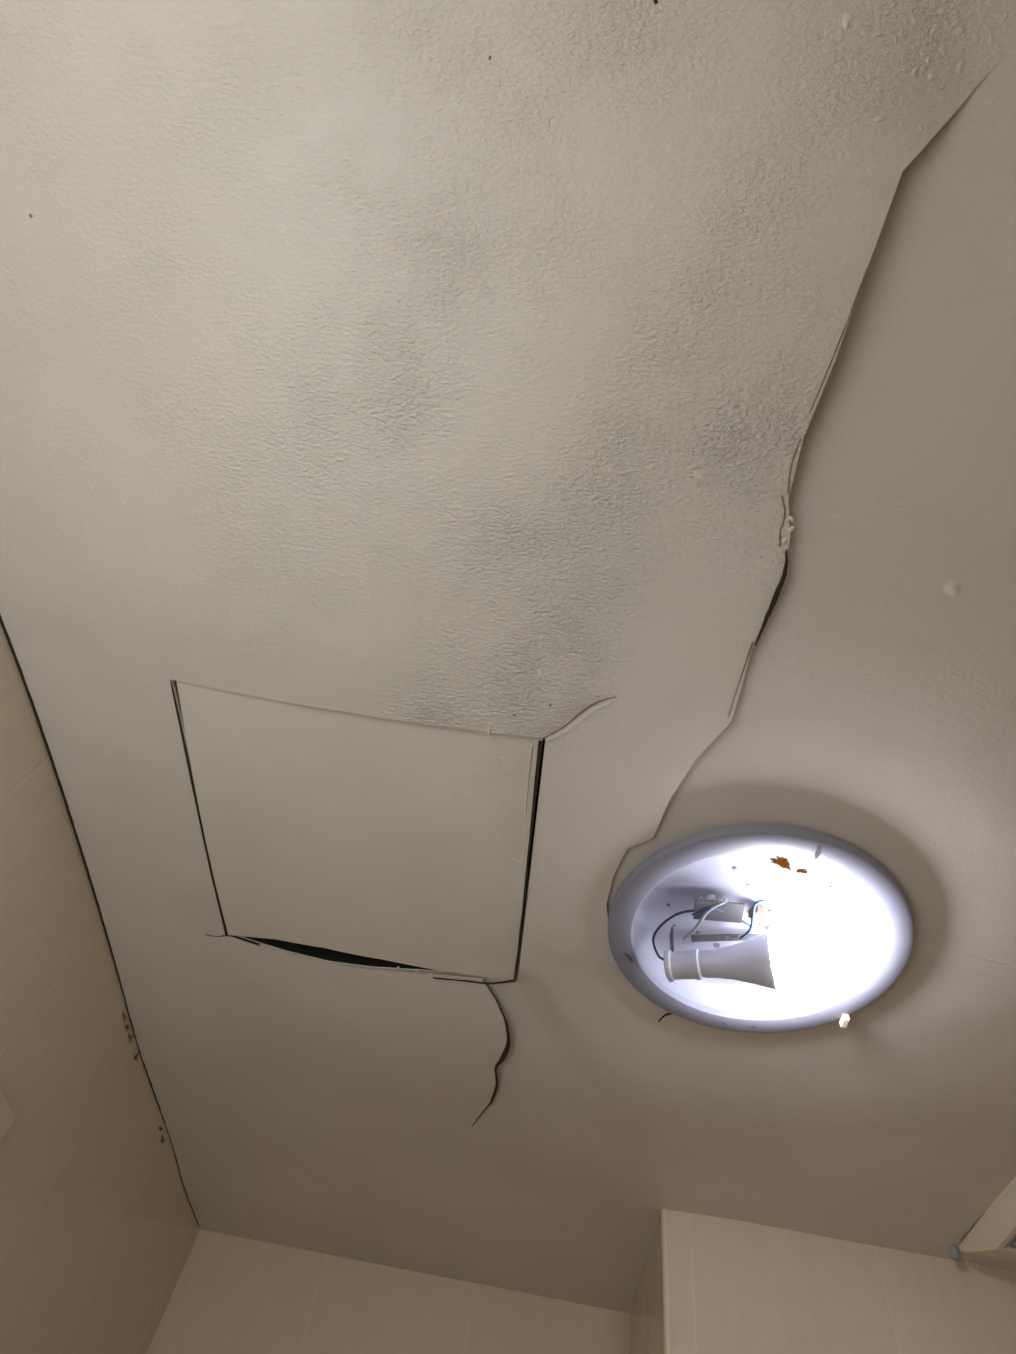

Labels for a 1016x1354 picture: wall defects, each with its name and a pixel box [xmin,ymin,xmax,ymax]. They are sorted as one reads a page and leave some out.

crack [728,268,867,717]
crack [170,680,616,1127]